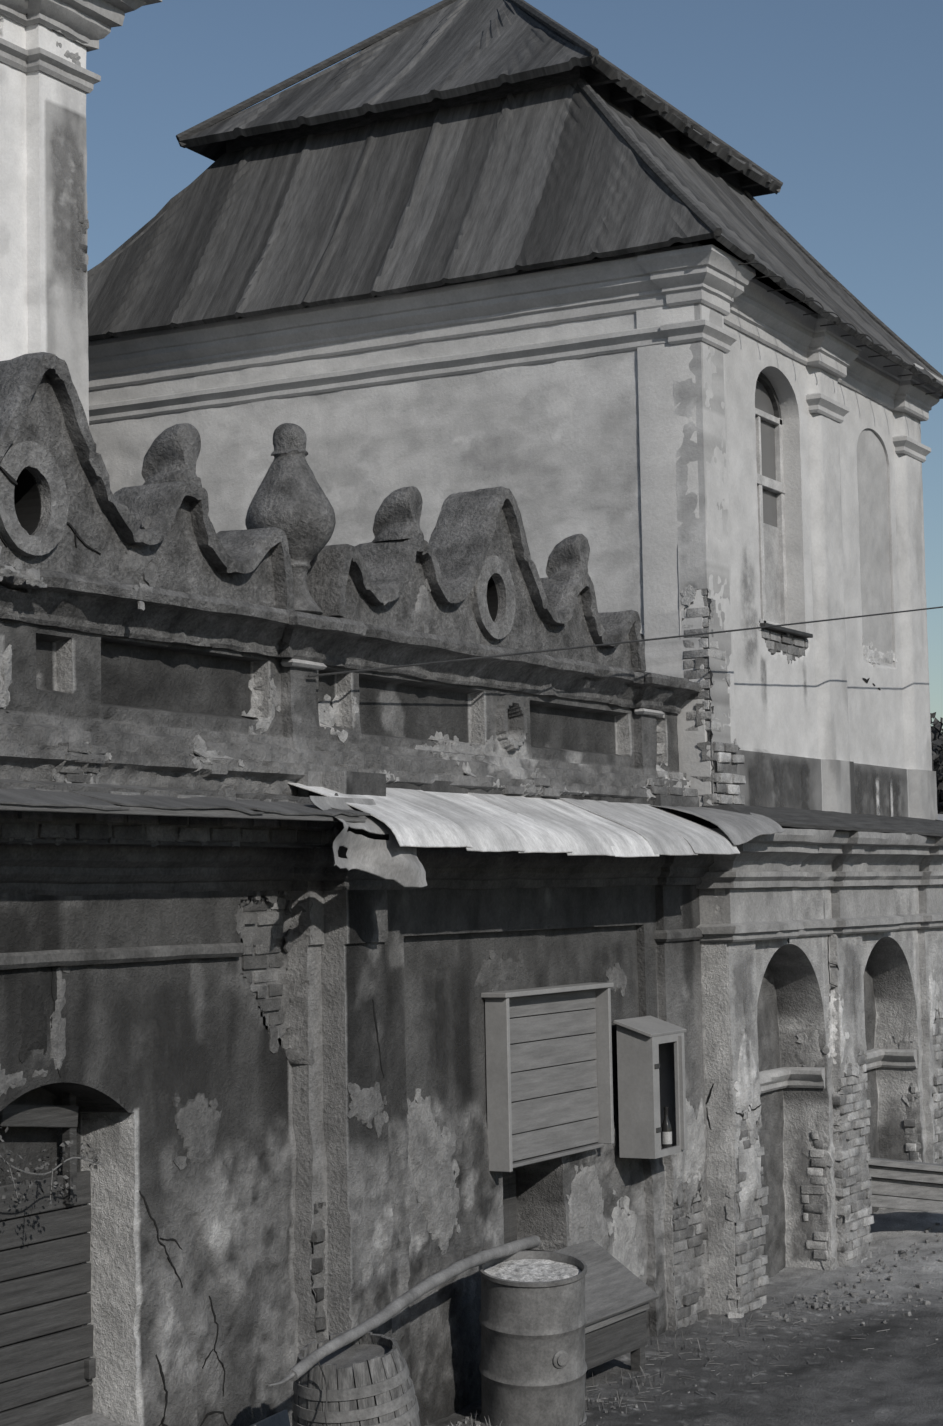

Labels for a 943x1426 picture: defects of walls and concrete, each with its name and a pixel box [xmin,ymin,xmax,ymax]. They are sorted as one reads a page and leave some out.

spalling [0,644,16,714]
flaking render [0,742,339,849]
spalling [190,735,244,773]
spalling [242,677,281,735]
flaking render [642,585,746,806]
flaking render [757,621,808,664]
flaking render [672,1016,769,1329]
flaking render [794,989,874,1271]
flaking render [902,969,943,1164]
crack [139,1190,229,1426]